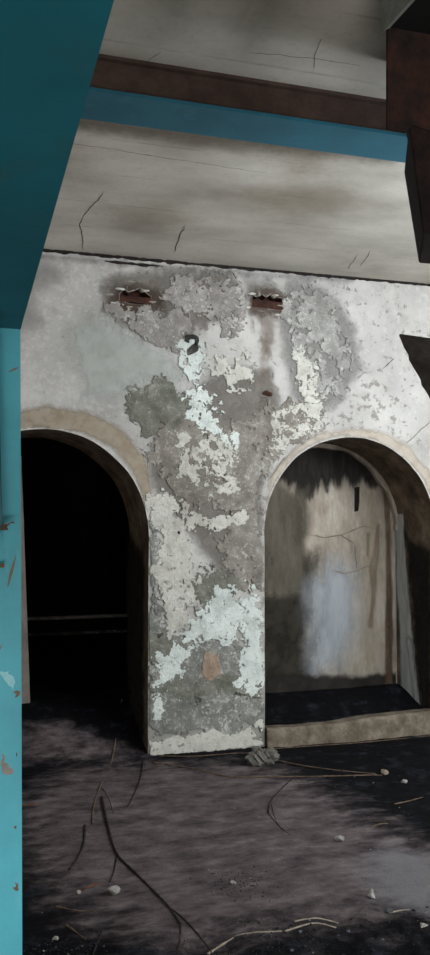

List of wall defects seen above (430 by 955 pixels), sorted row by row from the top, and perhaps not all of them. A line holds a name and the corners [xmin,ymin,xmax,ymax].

crack [43,192,430,287]
water stain [183,369,278,431]
water stain [21,406,430,704]
flaking render [101,270,360,755]
peeling [1,753,17,775]